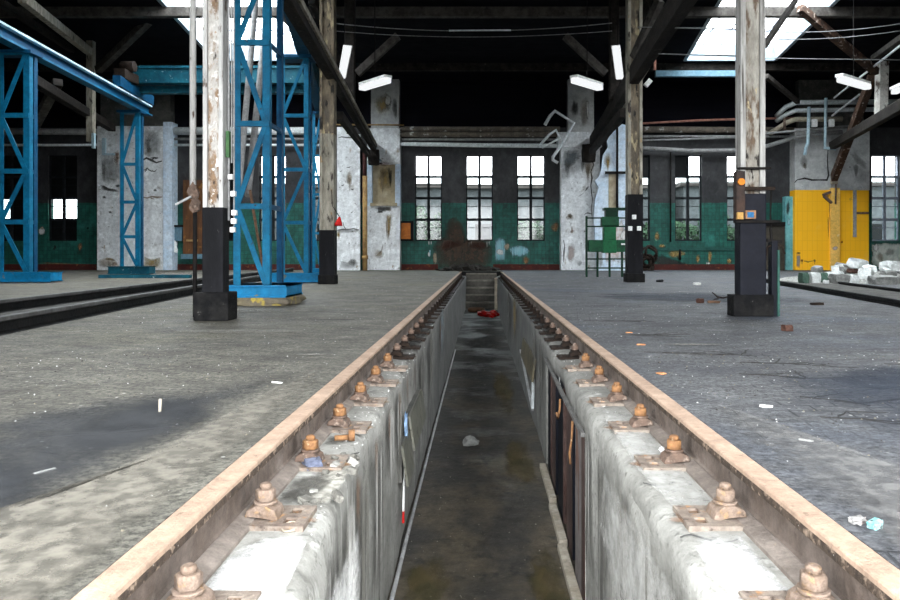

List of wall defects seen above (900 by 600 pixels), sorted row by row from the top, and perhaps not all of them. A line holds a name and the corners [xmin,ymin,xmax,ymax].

crack [144,157,162,172]
crack [585,162,594,215]
peeling [473,240,528,259]